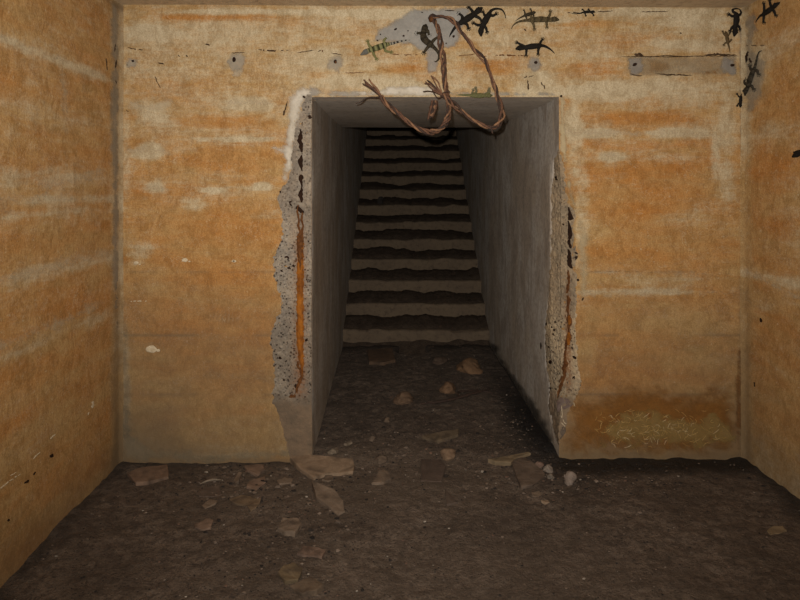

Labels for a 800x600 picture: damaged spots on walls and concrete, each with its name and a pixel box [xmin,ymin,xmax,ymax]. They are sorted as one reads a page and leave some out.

spalling [269,94,312,456]
water stain [273,88,319,179]
water stain [333,86,437,96]
spalling [540,149,584,445]